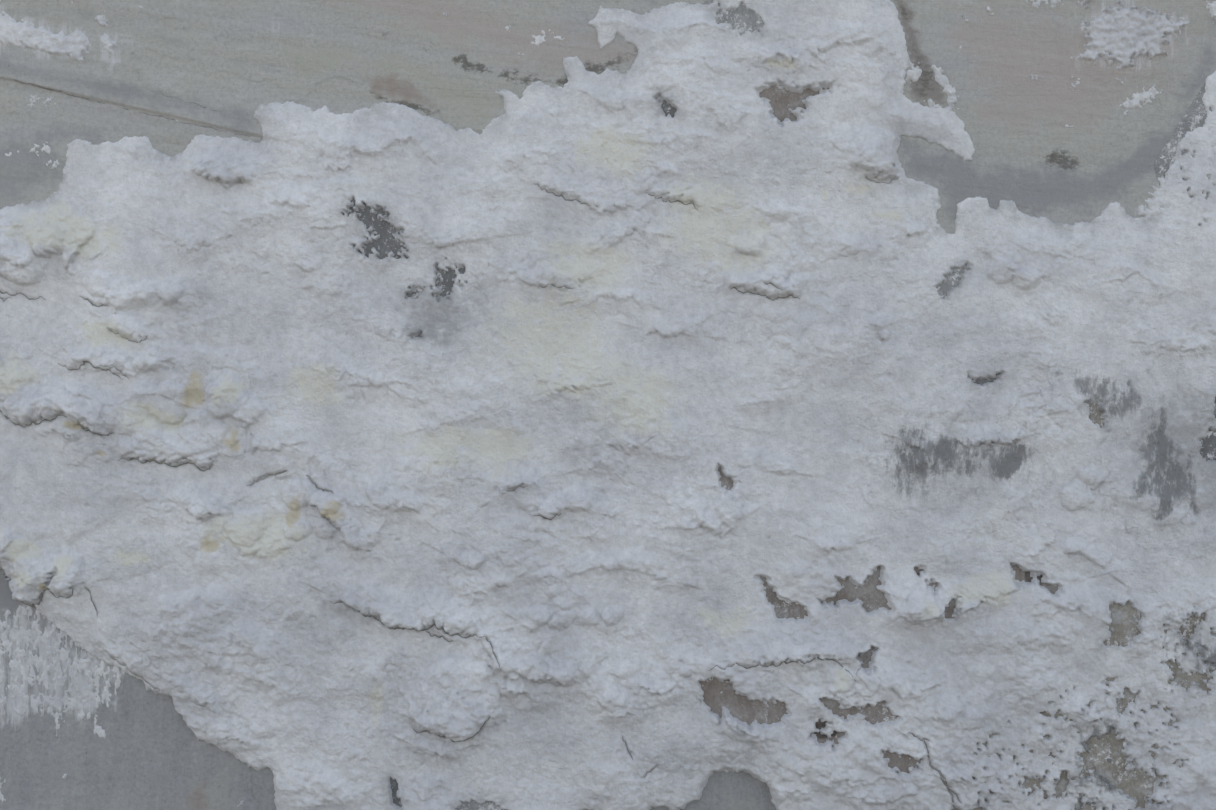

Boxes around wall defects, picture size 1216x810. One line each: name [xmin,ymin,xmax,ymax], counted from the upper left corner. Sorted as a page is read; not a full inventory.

peeling [343,198,409,259]
damp [621,155,808,294]
damp [378,278,502,360]
damp [446,244,667,425]
damp [853,388,1060,517]
damp [1087,349,1216,561]
peeling [821,566,892,613]
damp [933,560,1044,619]
crack [330,601,500,668]
peeling [699,677,788,726]
peeling [814,697,899,748]
spalling [972,689,1188,810]